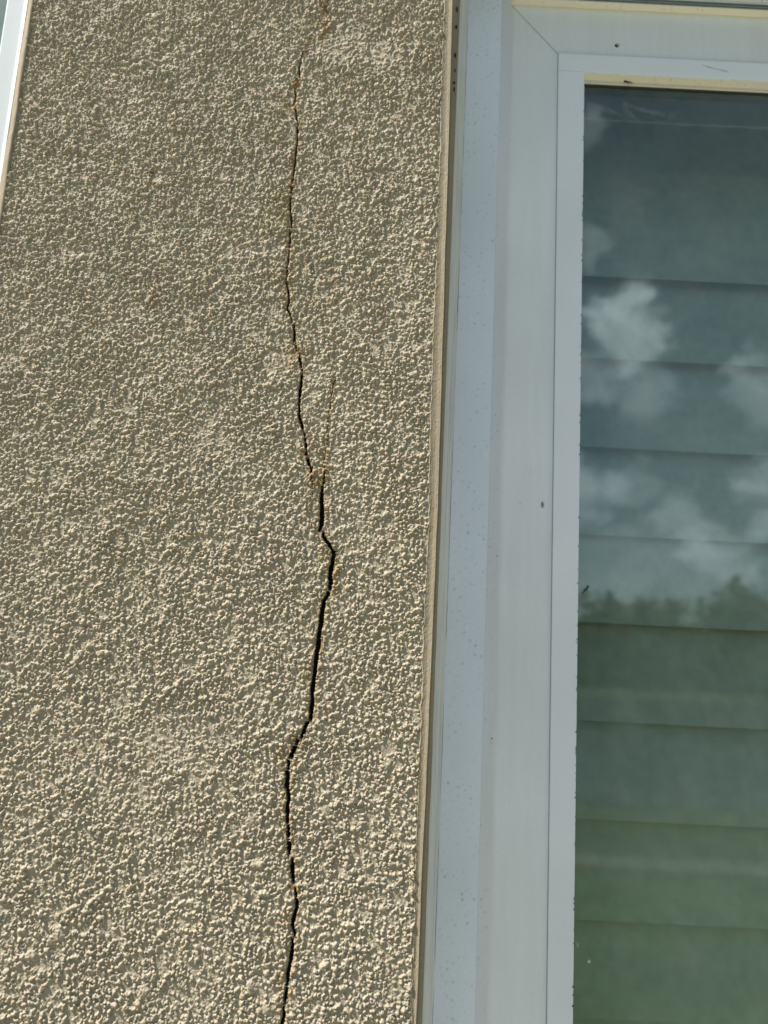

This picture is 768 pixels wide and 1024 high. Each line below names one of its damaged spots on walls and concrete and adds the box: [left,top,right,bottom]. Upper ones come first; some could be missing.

crack [280,66,337,1024]